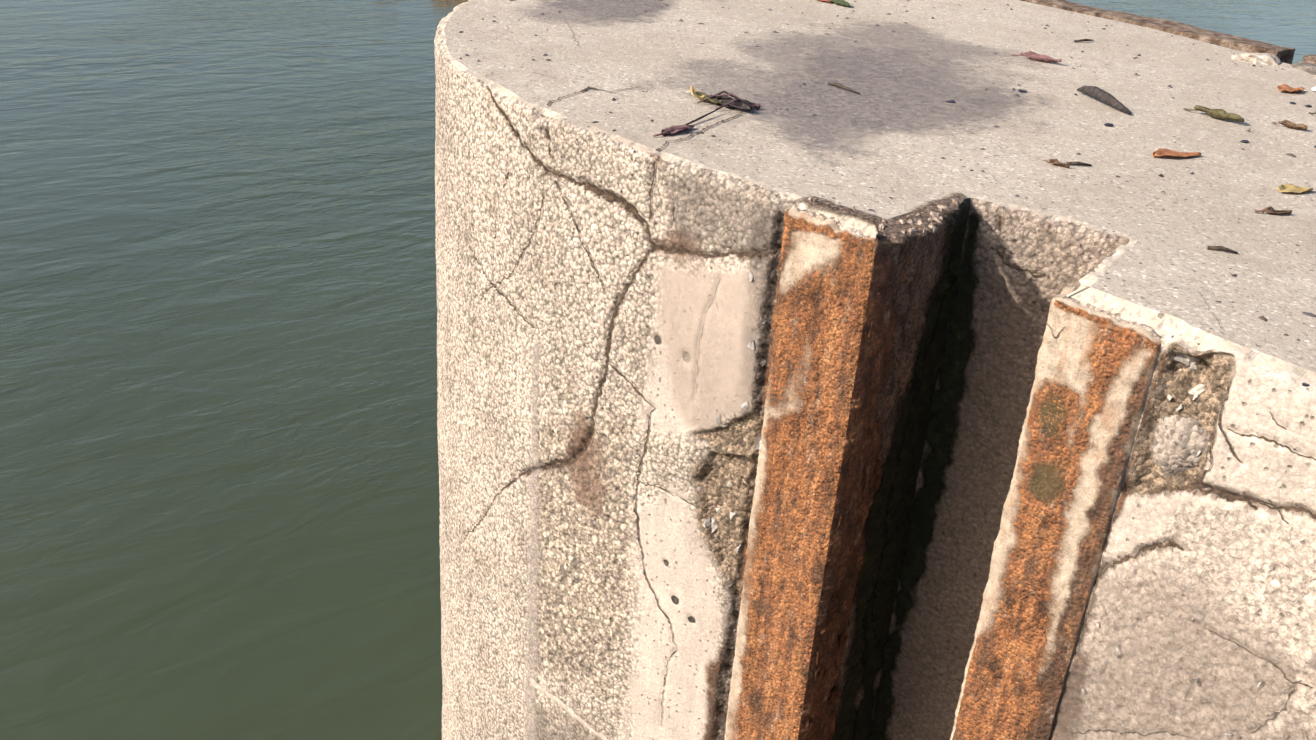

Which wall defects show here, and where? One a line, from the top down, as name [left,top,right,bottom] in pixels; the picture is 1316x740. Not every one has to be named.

crack [465,72,777,722]
spalling [692,214,784,740]
rust [703,212,956,740]
peeling [794,193,965,740]
rust [952,299,1168,740]
crack [1066,729,1191,738]
crack [1093,542,1183,585]
spalling [1129,342,1233,495]
crack [1123,395,1316,524]
crack [1208,629,1313,740]